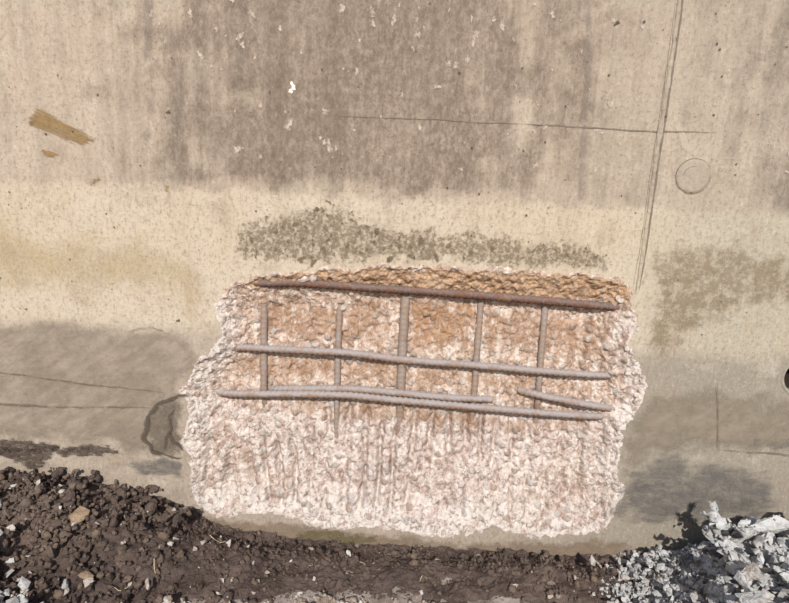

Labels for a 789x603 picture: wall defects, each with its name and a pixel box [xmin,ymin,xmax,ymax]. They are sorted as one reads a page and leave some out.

water stain [237,200,607,270]
corrosion [245,268,630,305]
water stain [651,252,789,345]
spalling [179,262,649,539]
water stain [0,439,117,469]
water stain [132,458,180,475]
water stain [615,460,770,524]